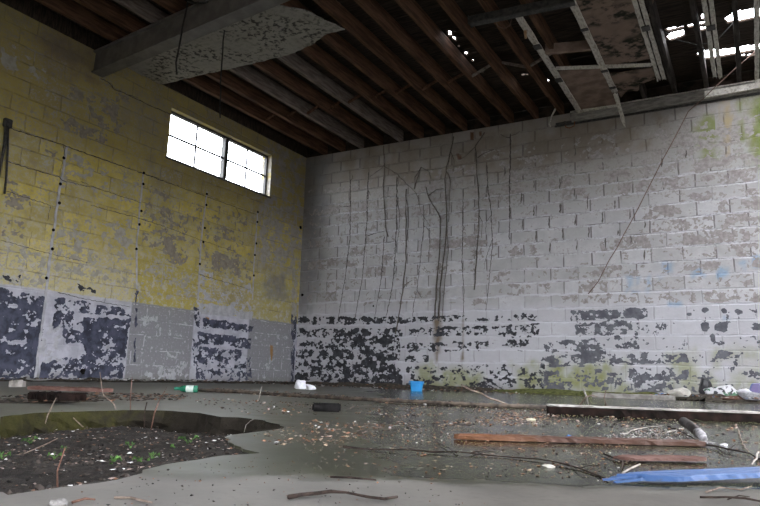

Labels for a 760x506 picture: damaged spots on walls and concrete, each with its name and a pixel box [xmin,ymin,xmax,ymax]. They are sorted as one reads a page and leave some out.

peeling [0,114,760,393]
damp [258,107,724,320]
damp [730,95,760,165]